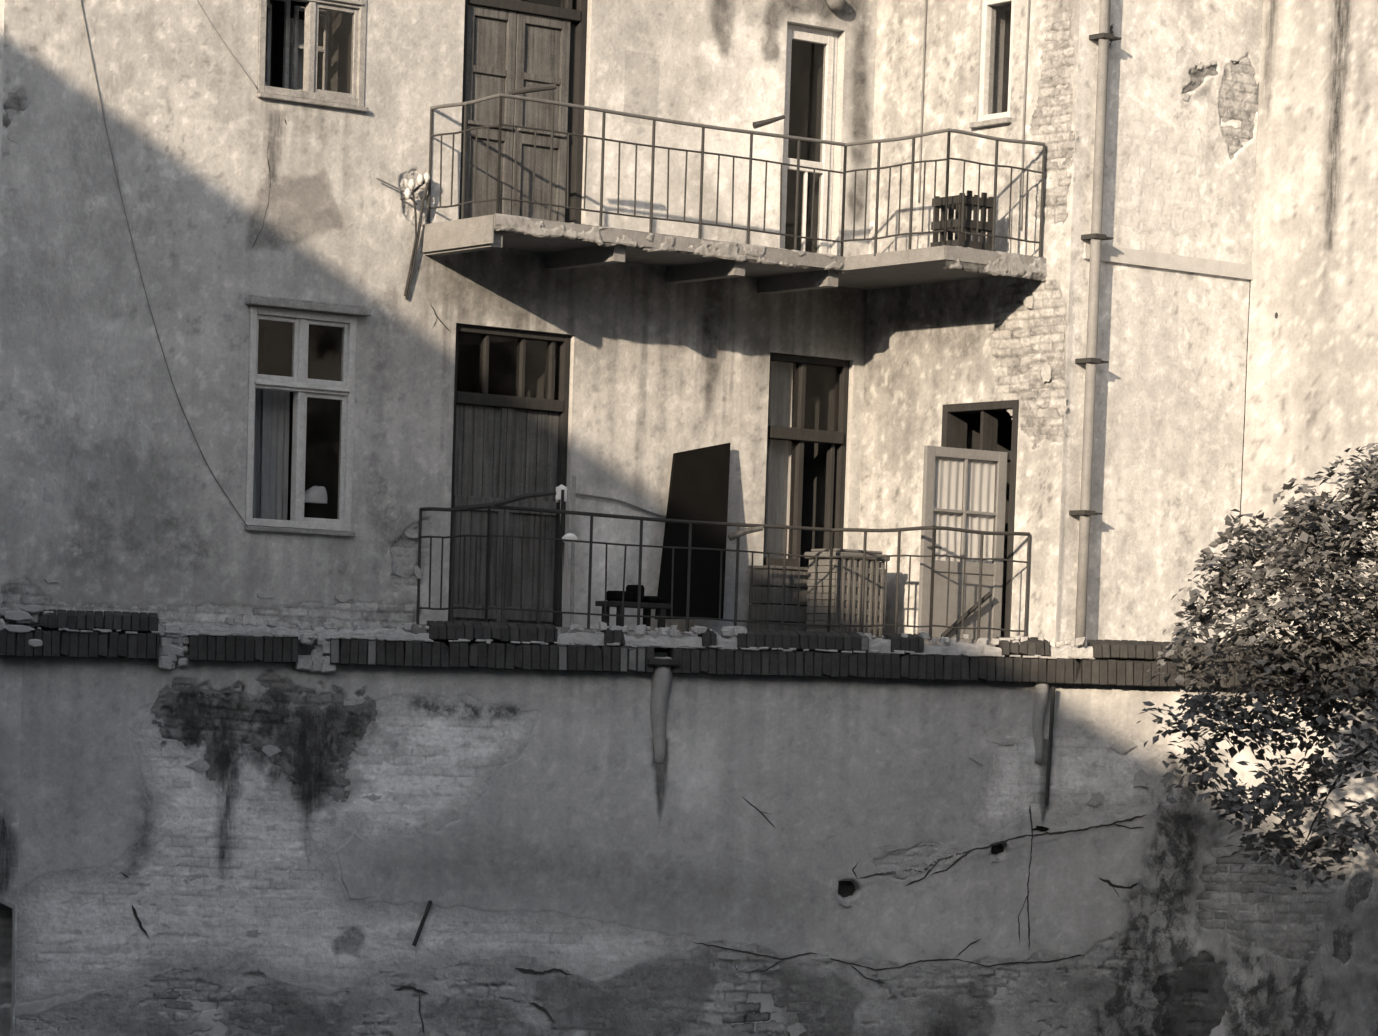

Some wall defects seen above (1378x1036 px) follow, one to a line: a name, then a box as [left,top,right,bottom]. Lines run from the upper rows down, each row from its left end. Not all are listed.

flaking render [1111,97,1202,237]
spalling [1182,54,1259,160]
leakage [170,693,370,792]
spalling [9,670,1230,1036]
crack [741,796,776,829]
crack [694,806,1148,984]